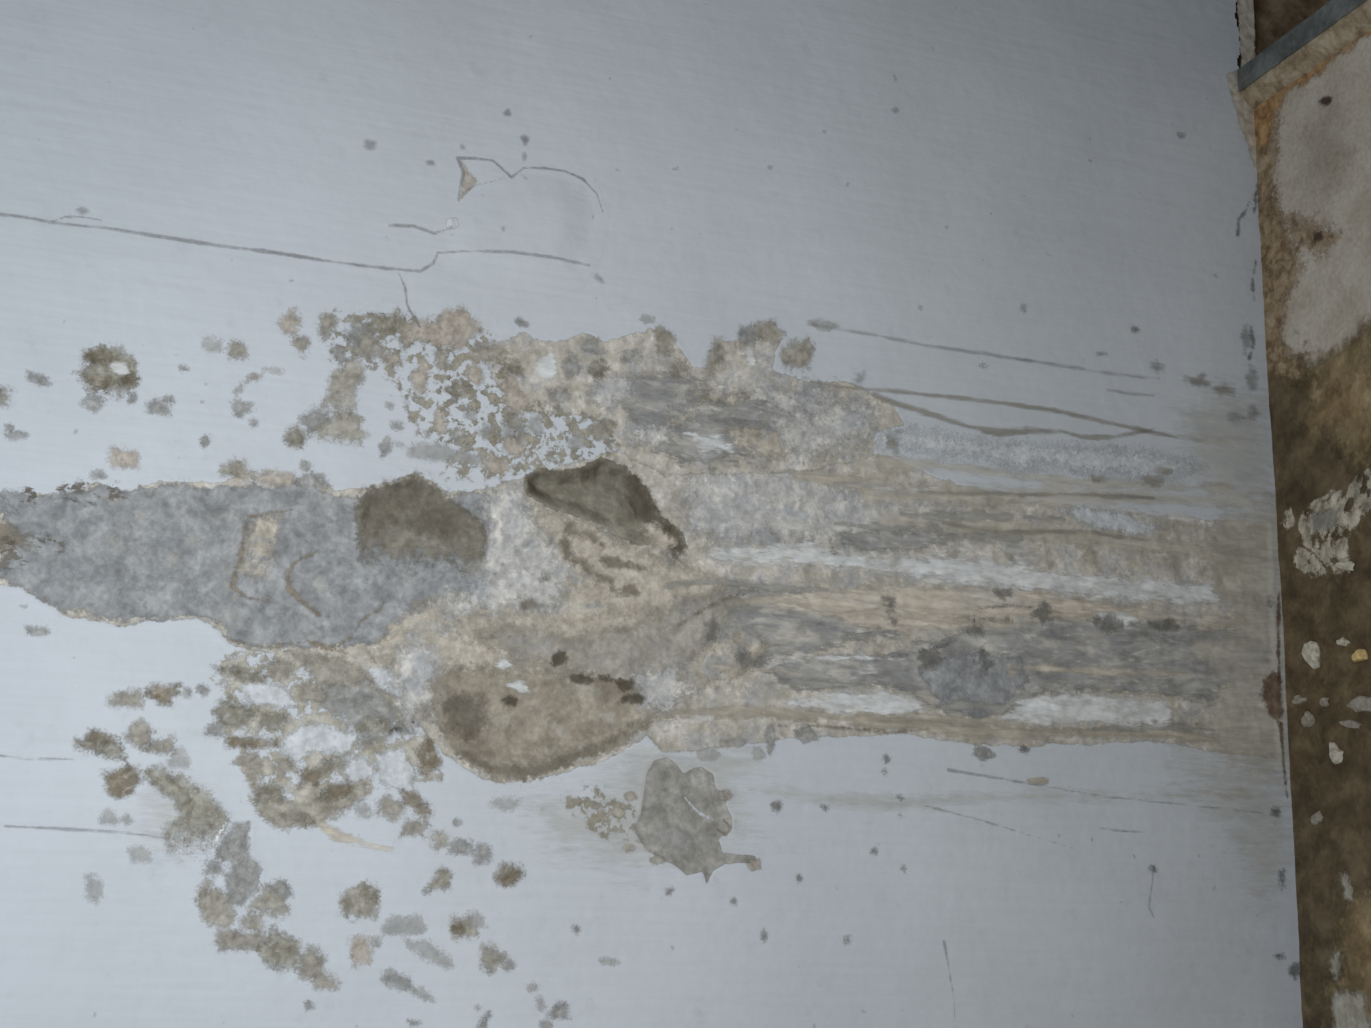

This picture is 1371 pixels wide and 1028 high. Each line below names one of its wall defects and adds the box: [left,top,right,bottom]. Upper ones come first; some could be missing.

crack [145,233,206,244]
crack [250,157,586,327]
damp [855,378,1252,558]
damp [1190,375,1231,394]
peeling [0,308,1290,1009]
damp [1235,324,1371,1028]
peeling [528,985,568,1028]